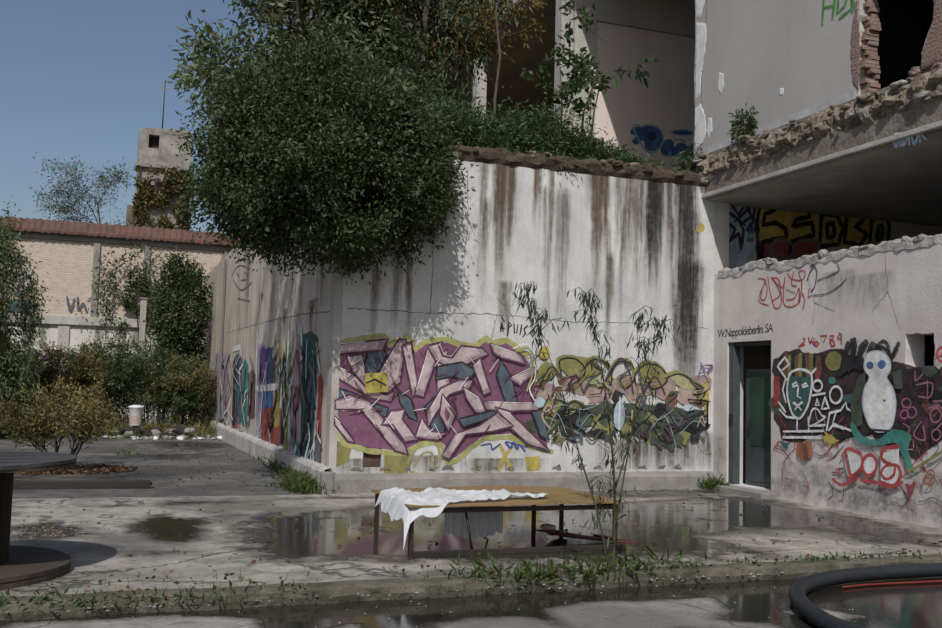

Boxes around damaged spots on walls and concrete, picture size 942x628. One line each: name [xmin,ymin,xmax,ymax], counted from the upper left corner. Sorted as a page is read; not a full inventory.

spalling [448,0,942,187]
damp [482,163,514,246]
damp [544,170,568,248]
damp [621,178,701,361]